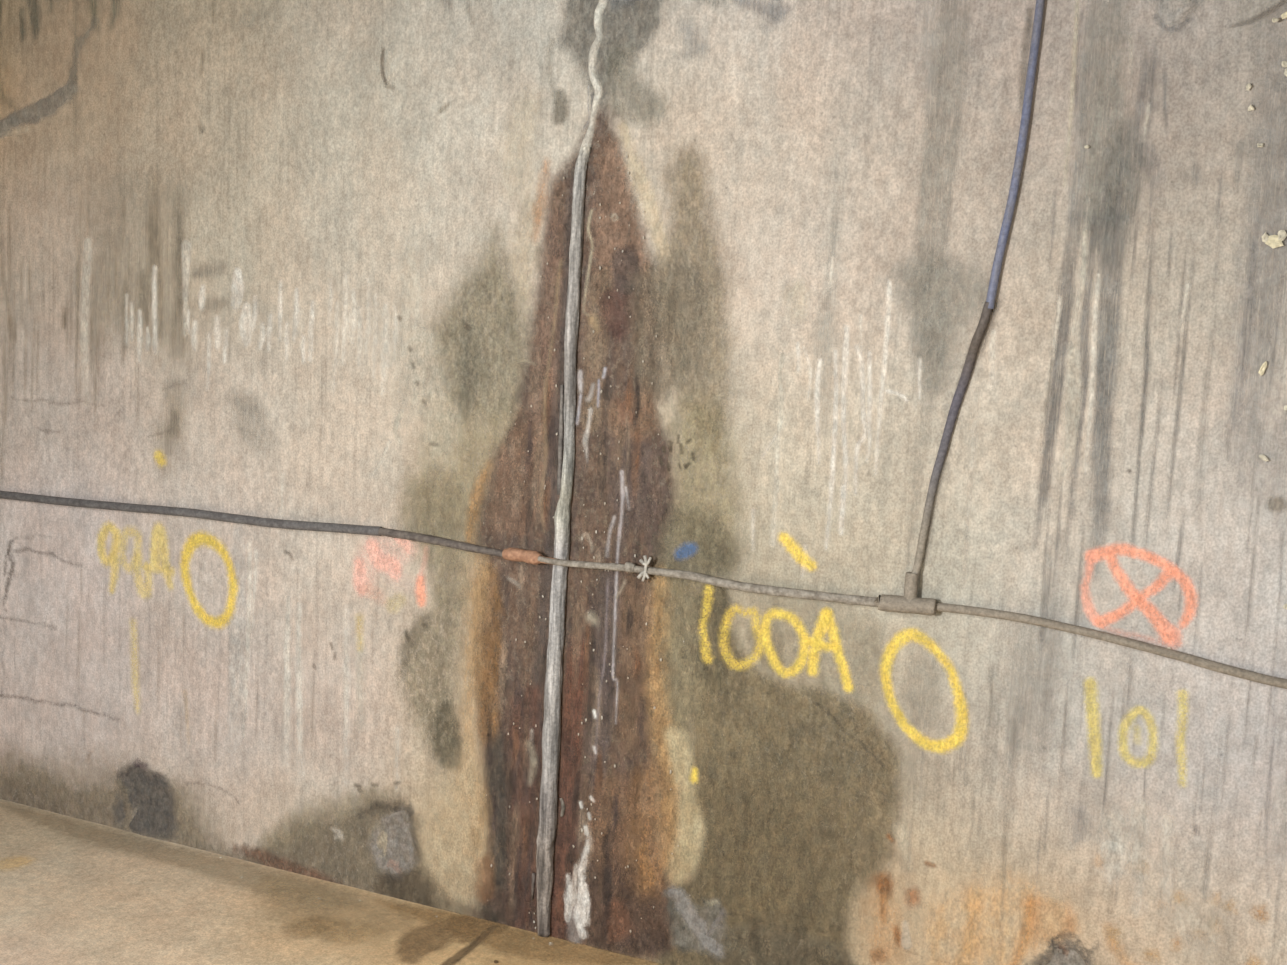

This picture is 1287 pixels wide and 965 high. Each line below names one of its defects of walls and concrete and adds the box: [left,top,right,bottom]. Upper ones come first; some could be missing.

leakage [19,0,52,39]
leakage [554,90,567,125]
leakage [559,0,666,124]
leakage [704,0,790,22]
leakage [764,0,989,545]
leakage [1037,0,1166,555]
leakage [1233,65,1287,429]
leakage [1178,284,1190,418]
leakage [0,148,910,965]
corrosion [427,108,706,958]
leakage [1268,496,1287,511]
spalling [1027,933,1097,965]